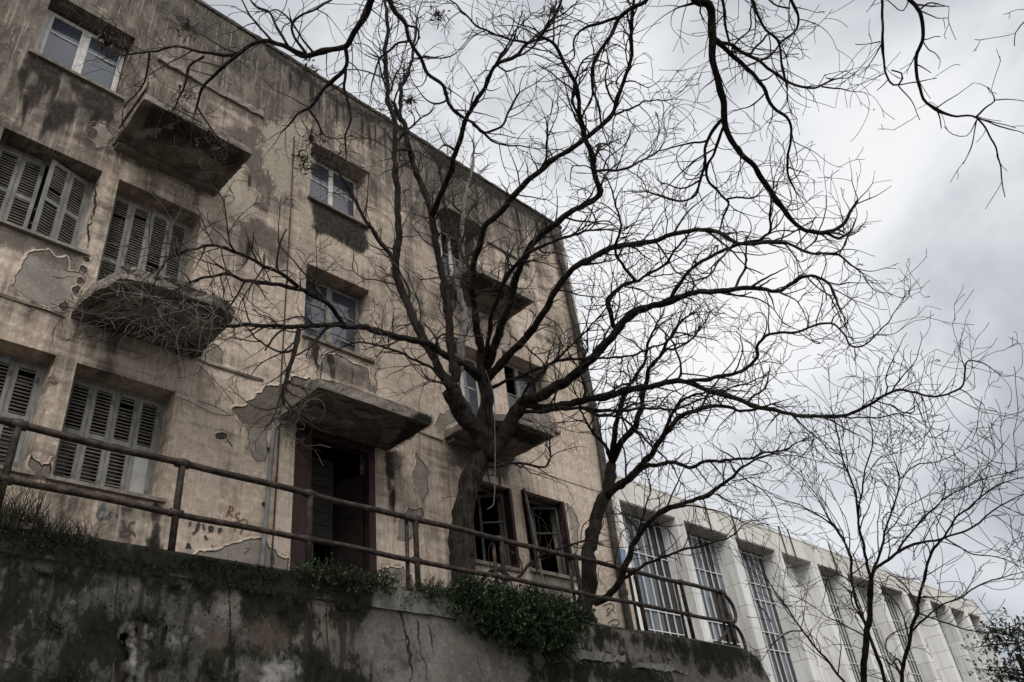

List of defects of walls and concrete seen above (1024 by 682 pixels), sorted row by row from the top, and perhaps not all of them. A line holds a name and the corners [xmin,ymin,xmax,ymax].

leakage [18,57,115,137]
leakage [262,44,549,243]
leakage [123,107,368,273]
peeling [6,248,92,314]
flaking render [228,342,382,463]
peeling [396,451,430,542]
peeling [176,522,290,570]
leakage [115,590,158,682]
leakage [261,621,299,682]
crack [399,611,434,682]